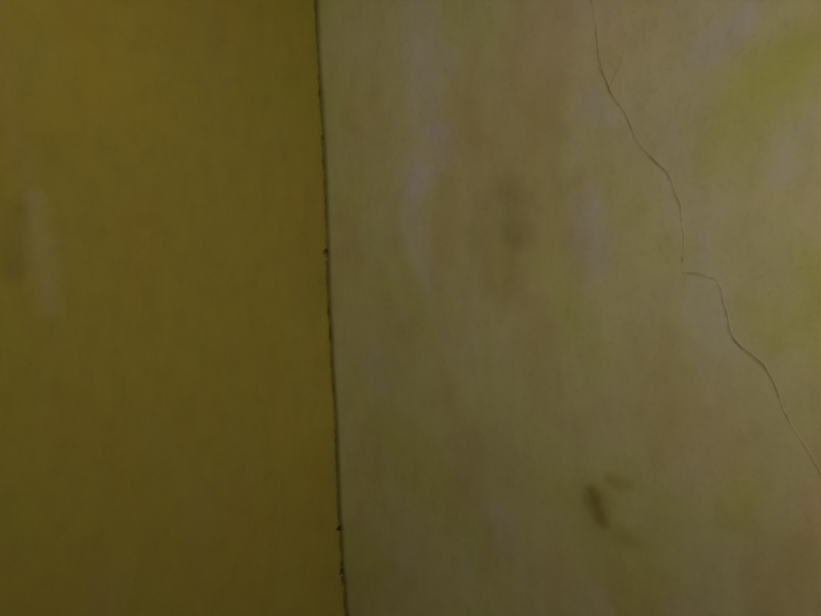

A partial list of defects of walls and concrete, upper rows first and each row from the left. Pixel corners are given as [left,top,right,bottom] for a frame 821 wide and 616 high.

crack [589,0,821,478]